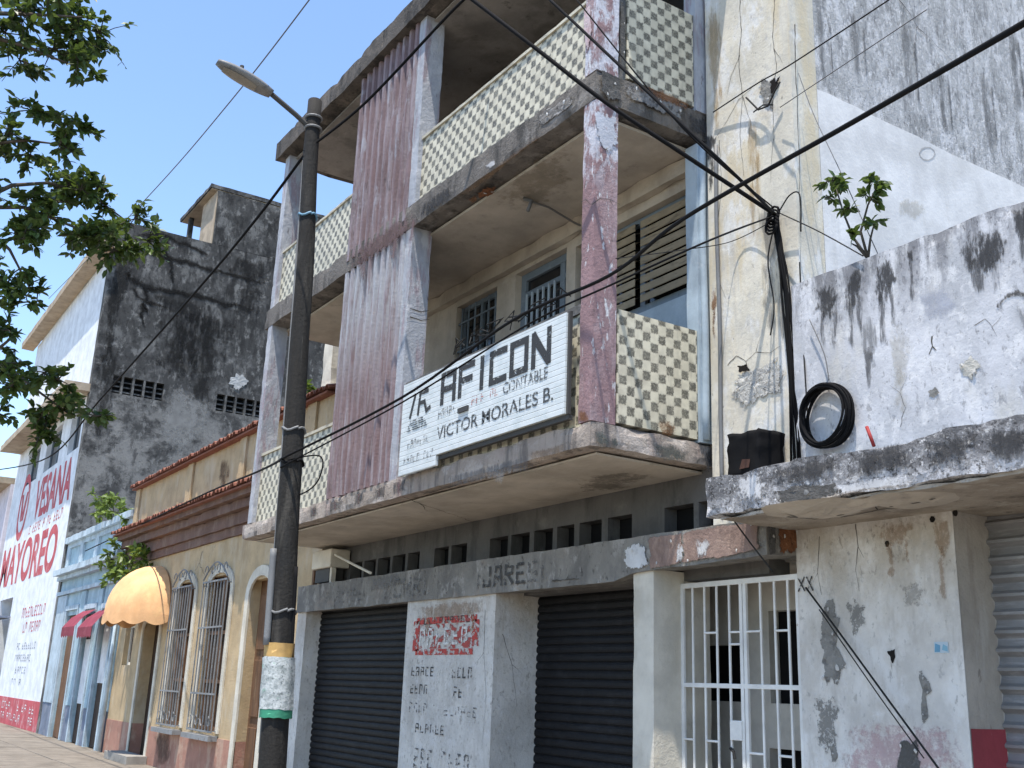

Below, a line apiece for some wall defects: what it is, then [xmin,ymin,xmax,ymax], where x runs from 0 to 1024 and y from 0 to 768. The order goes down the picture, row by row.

spalling [595,111,619,152]
damp [962,208,1024,292]
damp [816,268,863,344]
damp [876,260,896,342]
damp [157,295,234,445]
spalling [732,357,785,408]
damp [776,457,834,480]
damp [834,444,915,493]
damp [987,430,1024,460]
spalling [624,524,798,569]
spalling [814,599,865,762]
spalling [919,671,932,724]